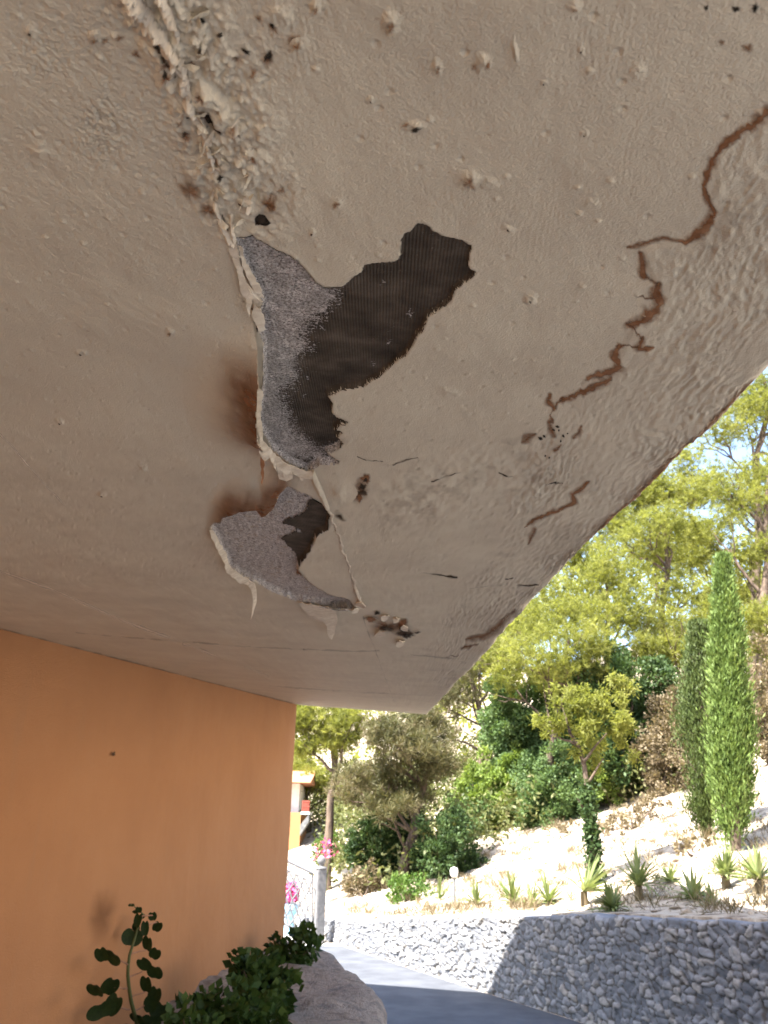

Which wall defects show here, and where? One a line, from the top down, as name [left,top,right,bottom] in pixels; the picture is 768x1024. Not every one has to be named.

spalling [162,10,223,83]
spalling [178,94,241,158]
crack [546,107,768,423]
peeling [209,153,476,640]
crack [525,481,590,544]